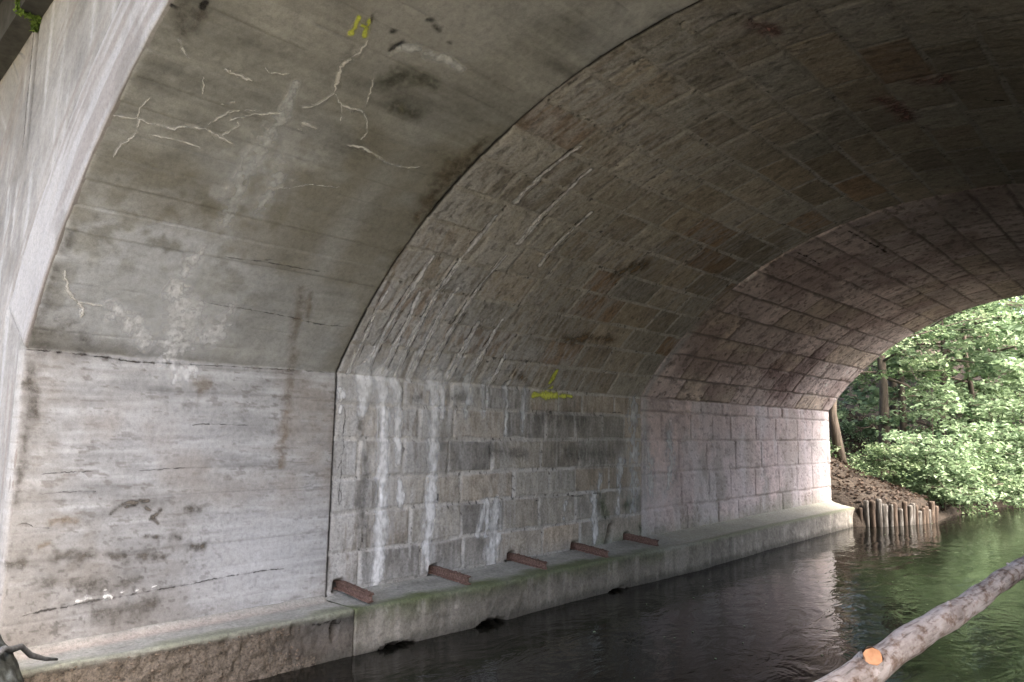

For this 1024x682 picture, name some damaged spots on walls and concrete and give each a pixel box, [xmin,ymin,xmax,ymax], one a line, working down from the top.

crack [113,39,420,171]
water stain [513,146,582,204]
water stain [516,168,592,245]
crack [64,270,102,317]
water stain [111,247,232,384]
water stain [346,215,526,586]